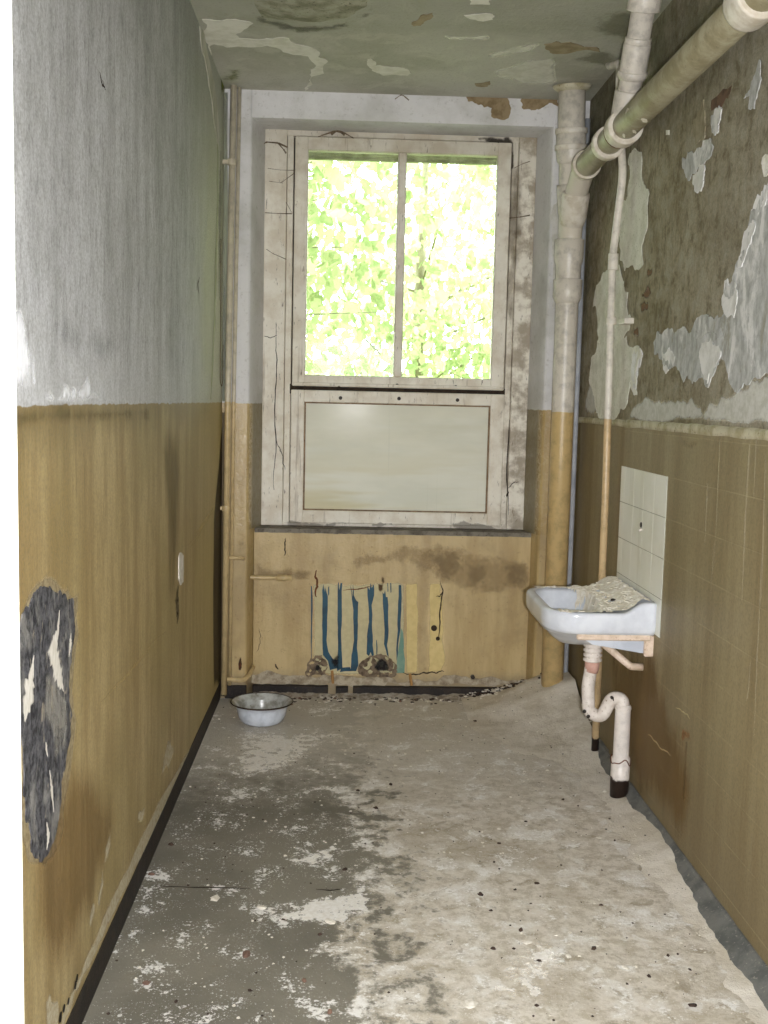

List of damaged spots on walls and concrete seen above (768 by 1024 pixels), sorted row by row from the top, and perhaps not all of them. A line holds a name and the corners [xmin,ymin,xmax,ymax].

peeling [464,0,495,21]
peeling [367,58,411,76]
peeling [466,81,558,120]
peeling [544,41,600,54]
peeling [743,59,762,110]
spalling [682,85,732,193]
peeling [589,148,768,420]
crack [265,335,285,487]
spalling [19,578,78,864]